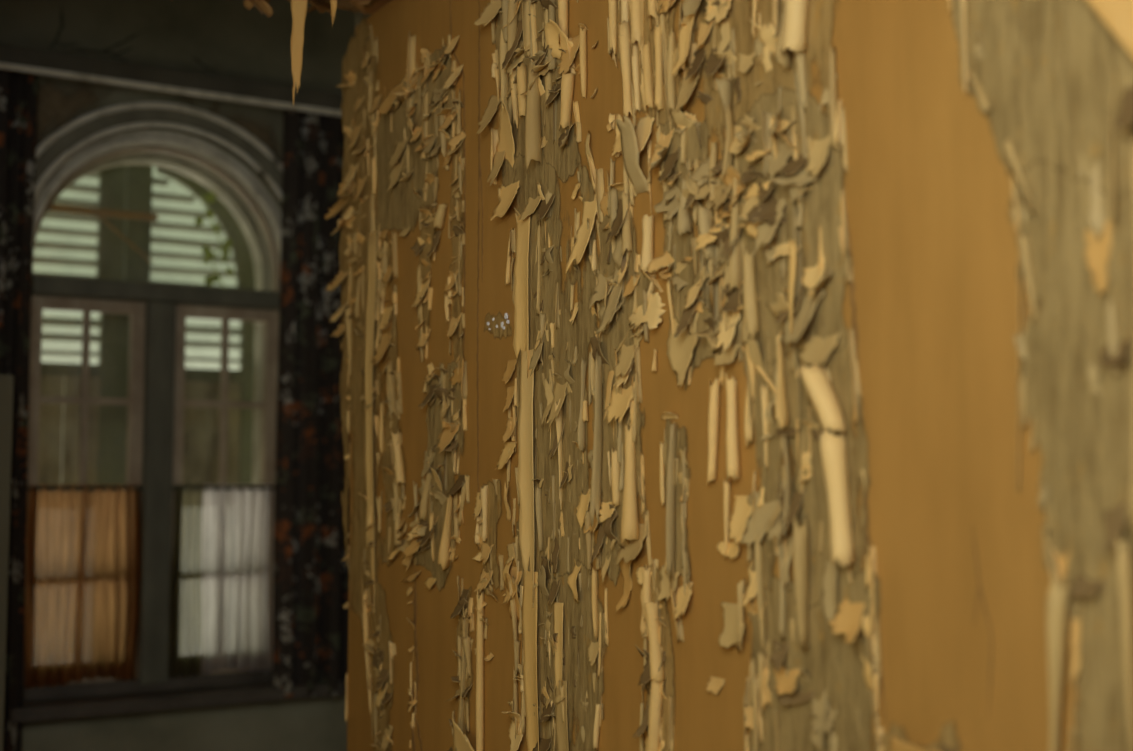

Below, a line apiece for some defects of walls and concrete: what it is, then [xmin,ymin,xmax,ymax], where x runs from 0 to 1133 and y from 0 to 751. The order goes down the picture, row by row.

peeling [229,0,274,17]
peeling [288,0,962,751]
peeling [948,0,1133,751]